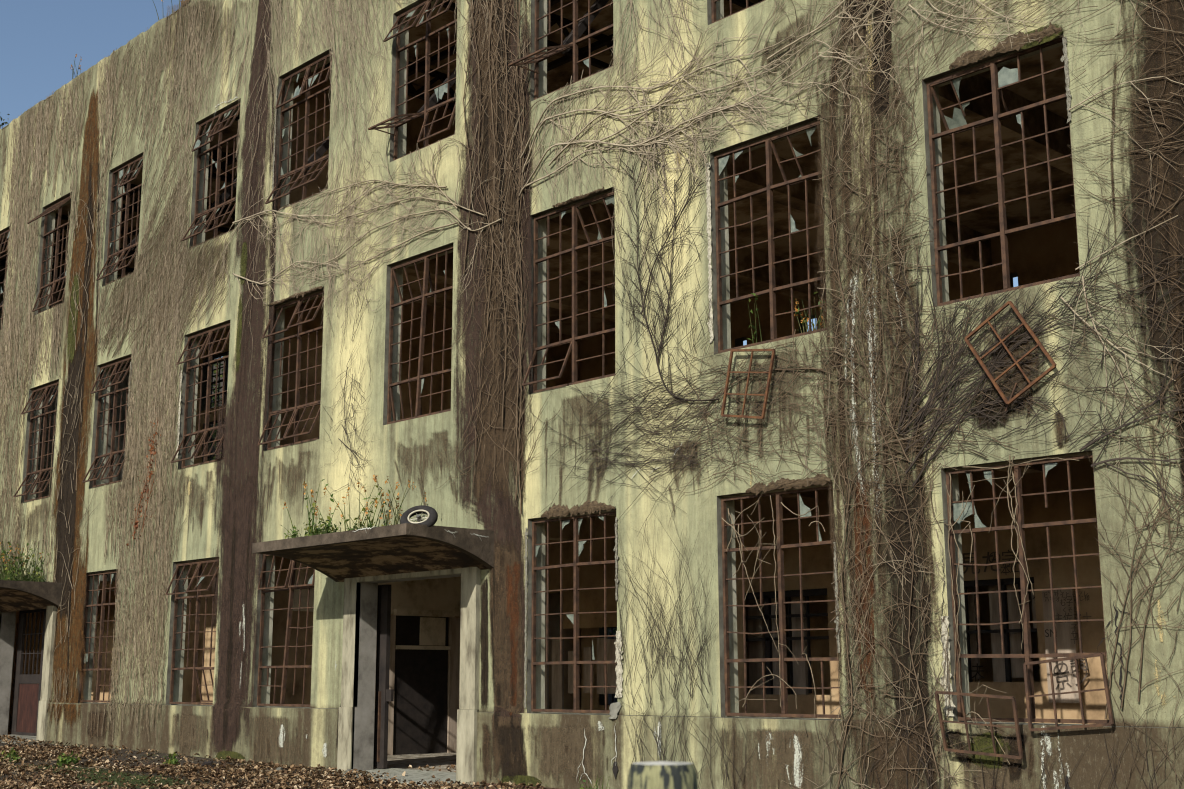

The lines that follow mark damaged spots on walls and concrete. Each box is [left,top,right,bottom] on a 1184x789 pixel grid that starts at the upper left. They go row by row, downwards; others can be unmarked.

leakage [16,90,111,740]
leakage [159,0,310,766]
leakage [395,0,612,782]
leakage [720,729,823,789]
leakage [737,0,1070,789]